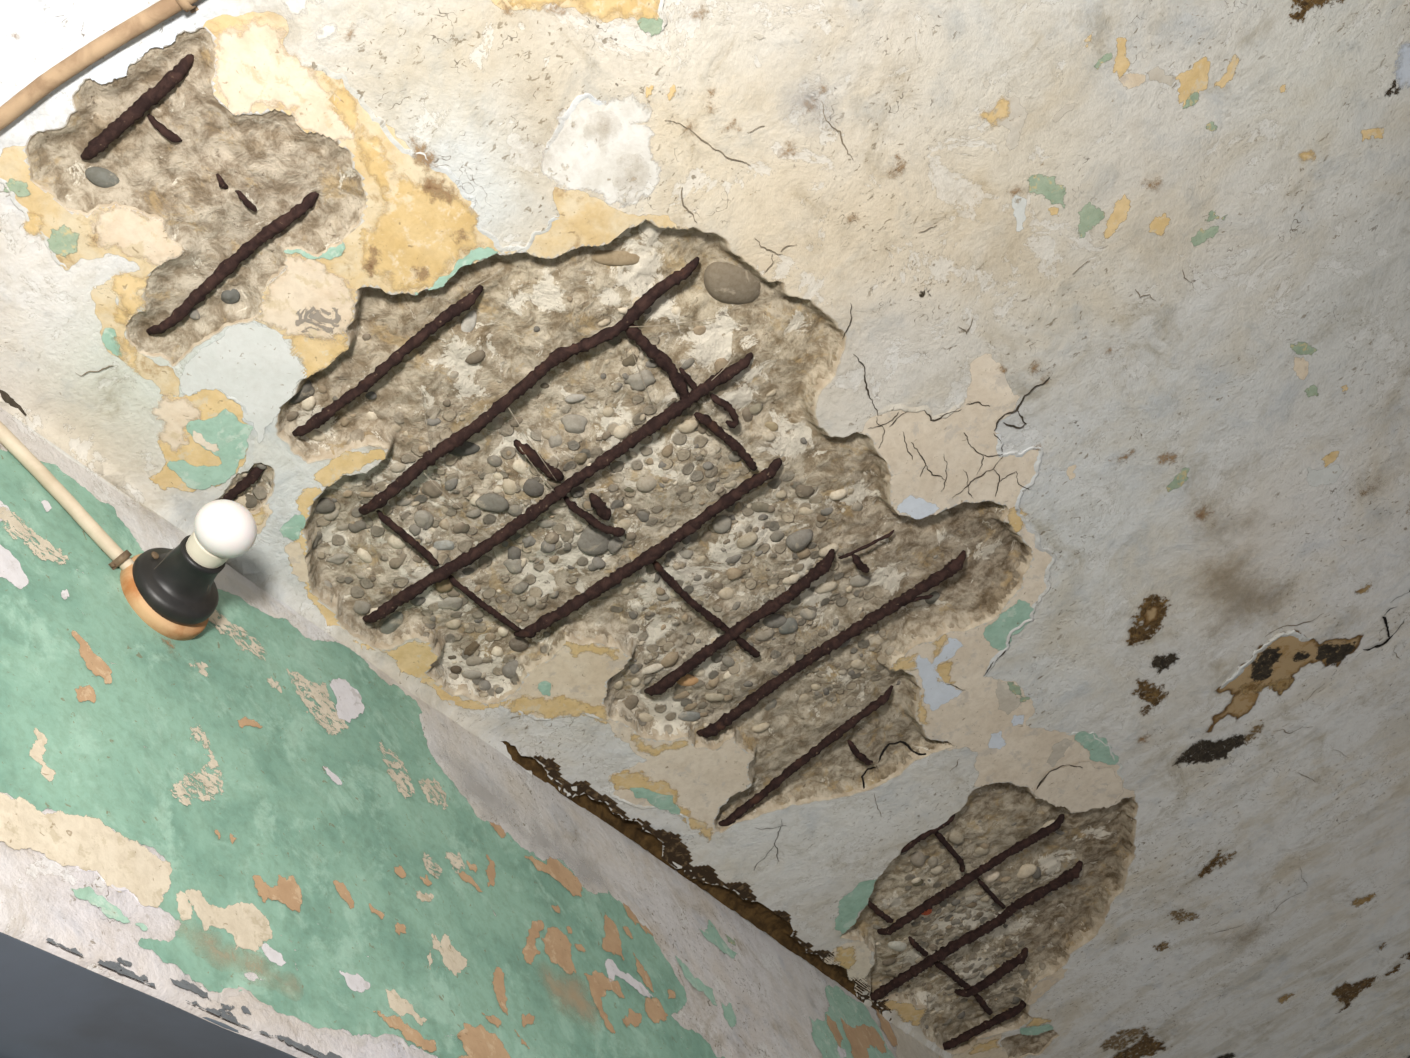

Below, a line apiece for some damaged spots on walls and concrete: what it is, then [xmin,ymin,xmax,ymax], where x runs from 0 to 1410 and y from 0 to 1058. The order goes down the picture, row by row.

peeling [491,0,667,37]
peeling [1095,37,1239,109]
rust [147,114,182,143]
rust [216,173,257,212]
peeling [1149,213,1171,236]
peeling [1191,211,1226,246]
crack [842,303,1050,498]
peeling [1159,454,1189,492]
spalling [0,11,1139,1058]
rust [838,530,894,559]